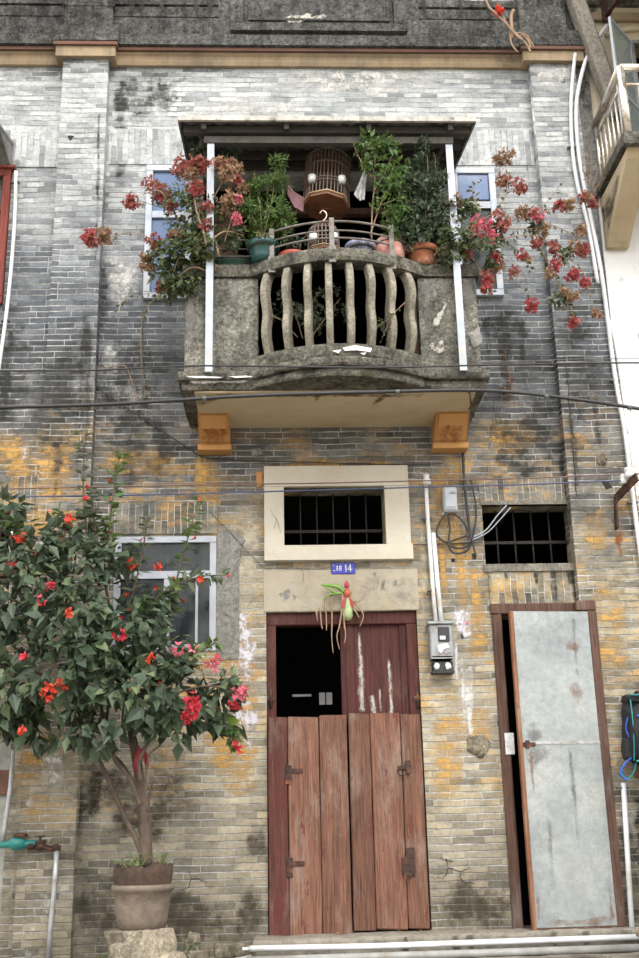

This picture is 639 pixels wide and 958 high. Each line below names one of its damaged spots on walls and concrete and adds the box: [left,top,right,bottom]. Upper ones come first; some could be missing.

flaking render [286,13,328,23]
leakage [114,75,178,129]
leakage [186,99,296,113]
leakage [289,70,424,95]
leakage [479,311,527,394]
leakage [563,311,601,442]
leakage [489,398,584,478]
crack [435,858,473,884]